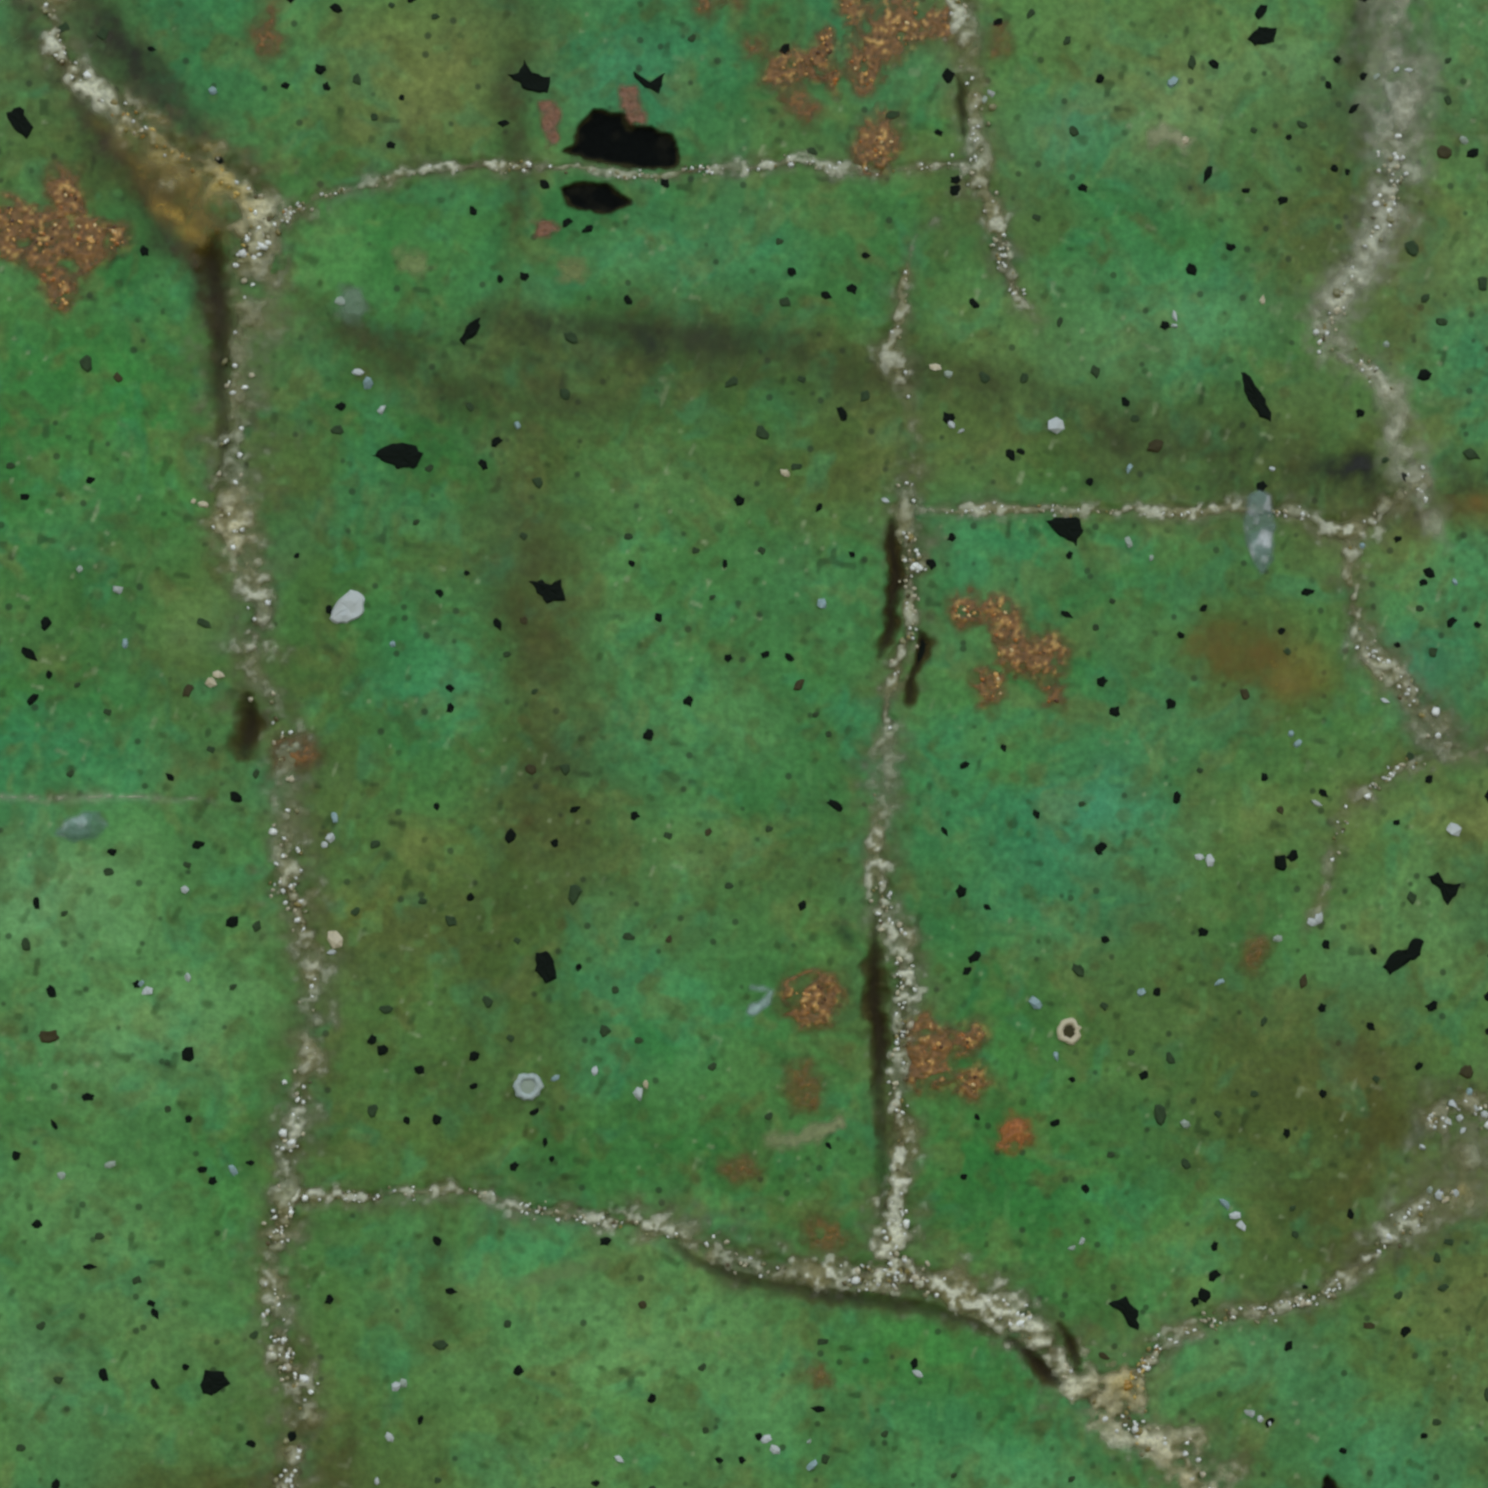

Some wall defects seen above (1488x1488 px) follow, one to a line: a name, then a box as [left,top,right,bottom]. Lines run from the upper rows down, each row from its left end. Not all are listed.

rust [745,0,953,121]
rust [853,110,901,176]
rust [0,165,127,312]
crack [1313,16,1420,400]
crack [42,0,1029,790]
rust [949,587,1070,707]
rust [781,969,845,1029]
crack [260,415,1488,1488]
rust [906,1011,990,1101]
rust [997,1118,1031,1150]